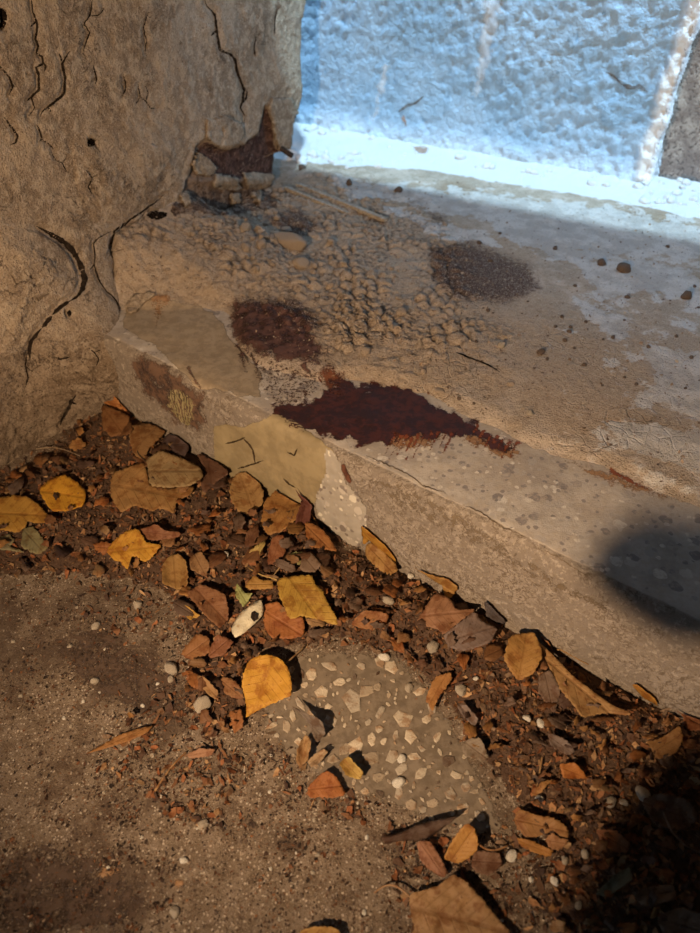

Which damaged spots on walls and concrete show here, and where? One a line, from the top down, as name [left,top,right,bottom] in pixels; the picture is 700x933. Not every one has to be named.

crack [0,0,104,193]
crack [205,1,278,122]
flaking render [171,98,299,217]
crack [25,194,164,387]
water stain [131,352,207,435]
corrosion [314,364,344,398]
crack [456,352,500,372]